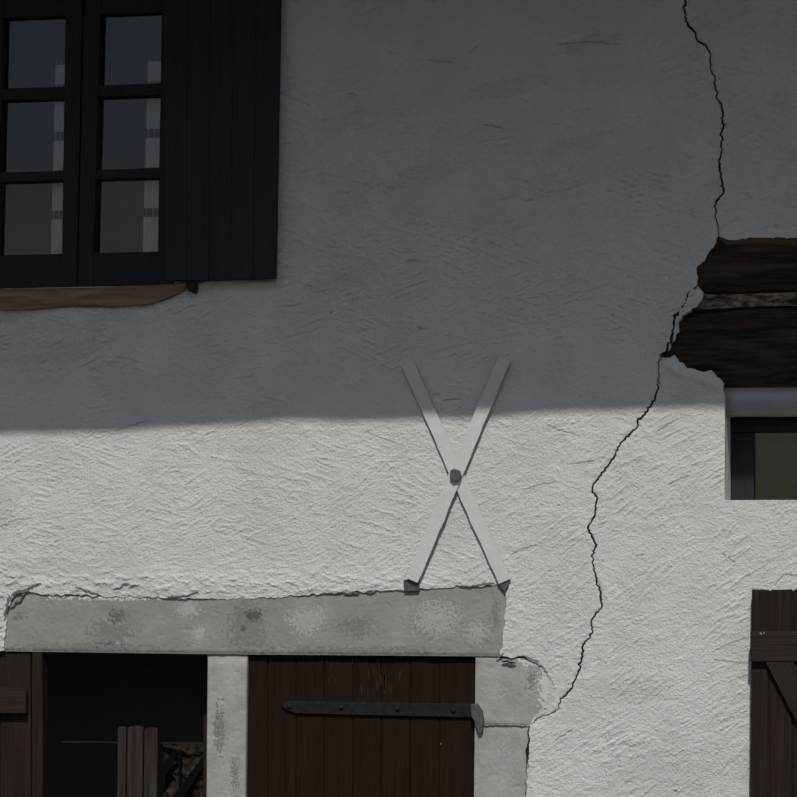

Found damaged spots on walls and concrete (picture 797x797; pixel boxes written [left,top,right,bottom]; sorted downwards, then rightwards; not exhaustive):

crack [683,0,725,239]
crack [484,284,698,797]
crack [0,583,41,629]
crack [75,583,139,595]
crack [167,591,199,599]